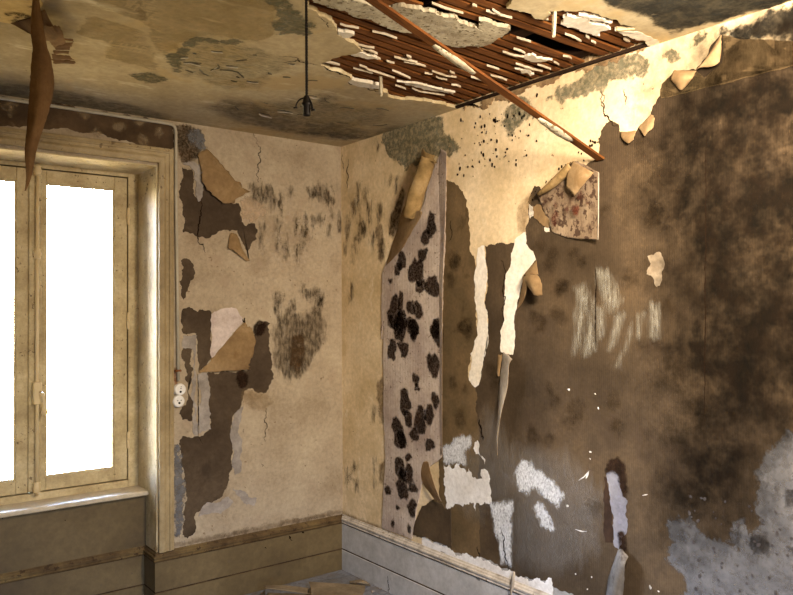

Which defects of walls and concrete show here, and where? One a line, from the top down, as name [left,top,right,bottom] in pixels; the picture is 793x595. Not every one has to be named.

peeling [180,53,259,84]
spalling [309,0,660,111]
leakage [377,53,649,177]
crack [600,92,614,126]
peeling [179,168,258,258]
peeling [179,258,274,539]
leakage [274,289,326,378]
leakage [380,373,440,533]
leakage [387,211,439,361]
leakage [427,318,444,378]
peeling [603,457,628,550]
leakage [605,0,793,595]